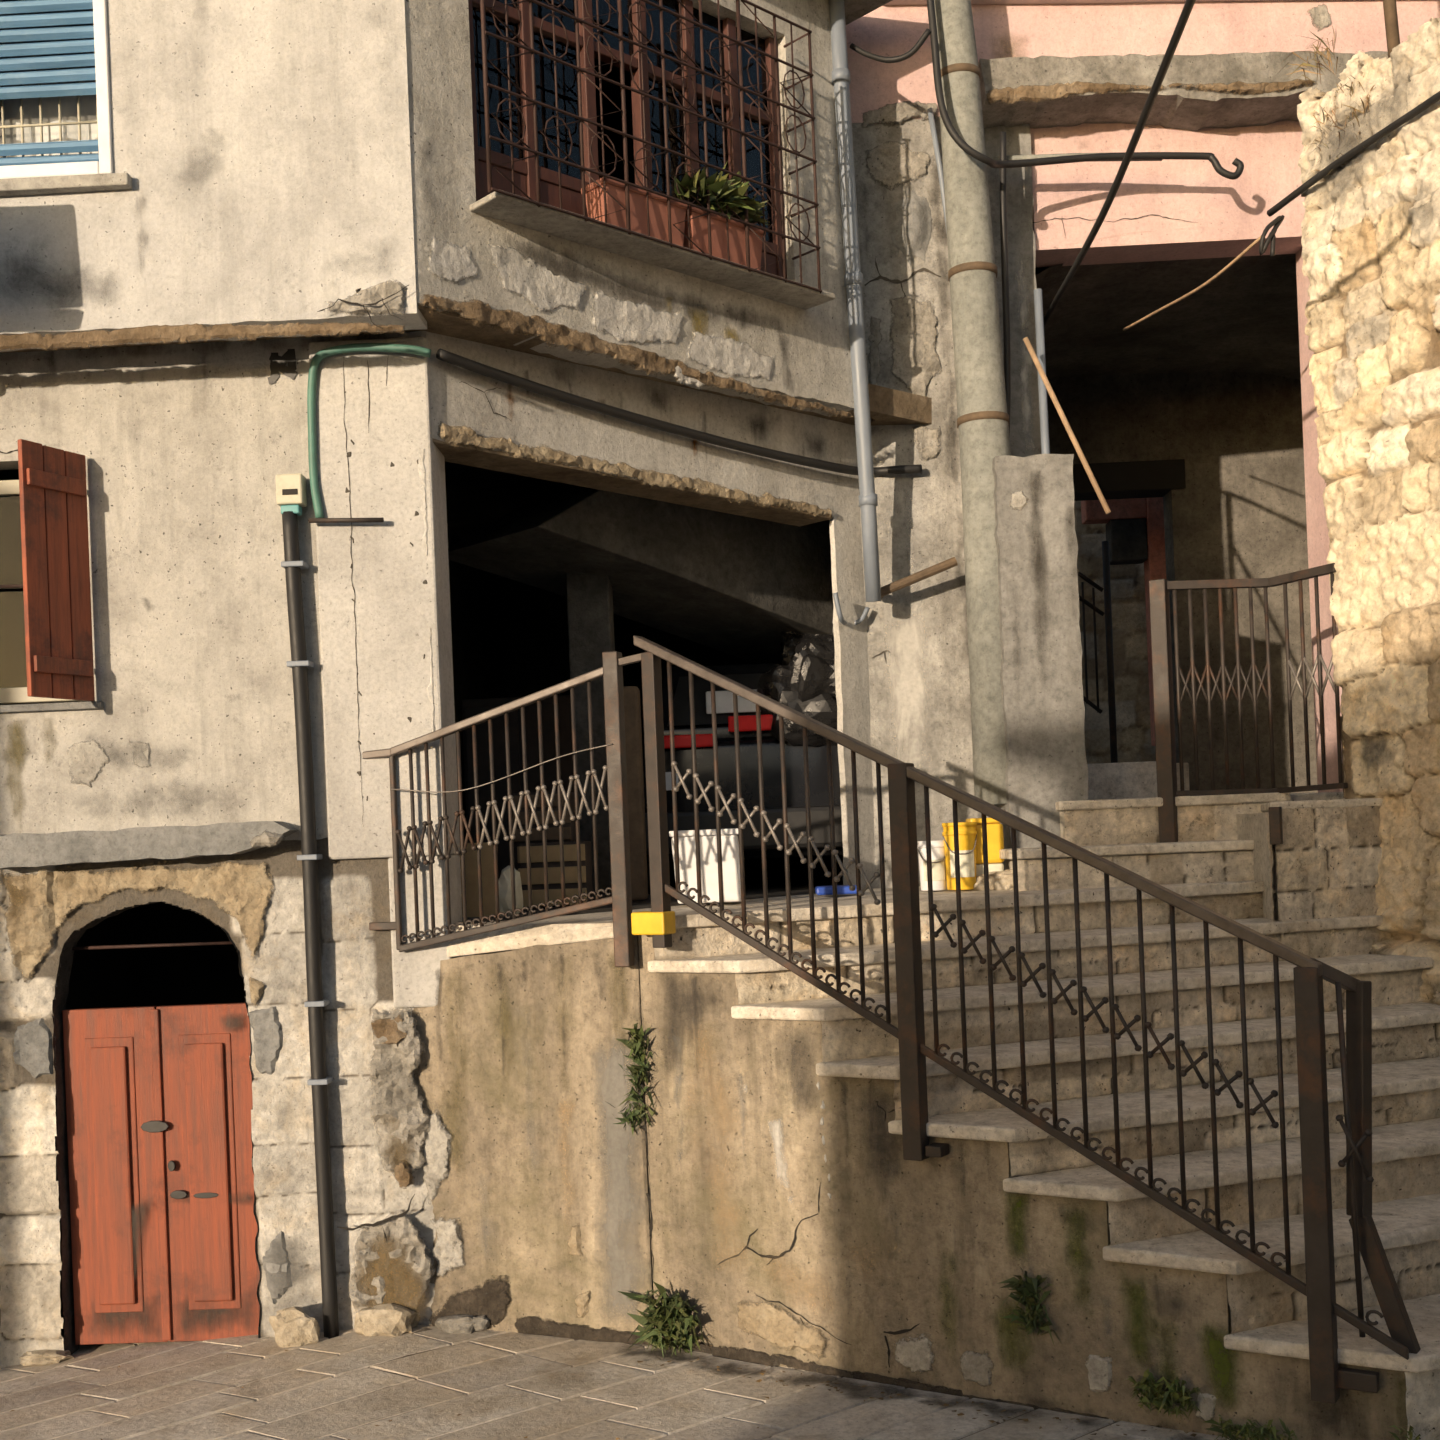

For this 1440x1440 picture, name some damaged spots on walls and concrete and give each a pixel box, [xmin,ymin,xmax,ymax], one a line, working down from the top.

peeling [0,237,854,418]
crack [865,259,941,296]
crack [317,285,409,827]
damp [9,726,25,787]
spalling [4,832,283,983]
spalling [249,977,265,1005]
spalling [369,1008,451,1201]
crack [640,1005,654,1275]
spalling [349,1210,1116,1423]
crack [718,1182,851,1345]
crack [883,1324,919,1368]